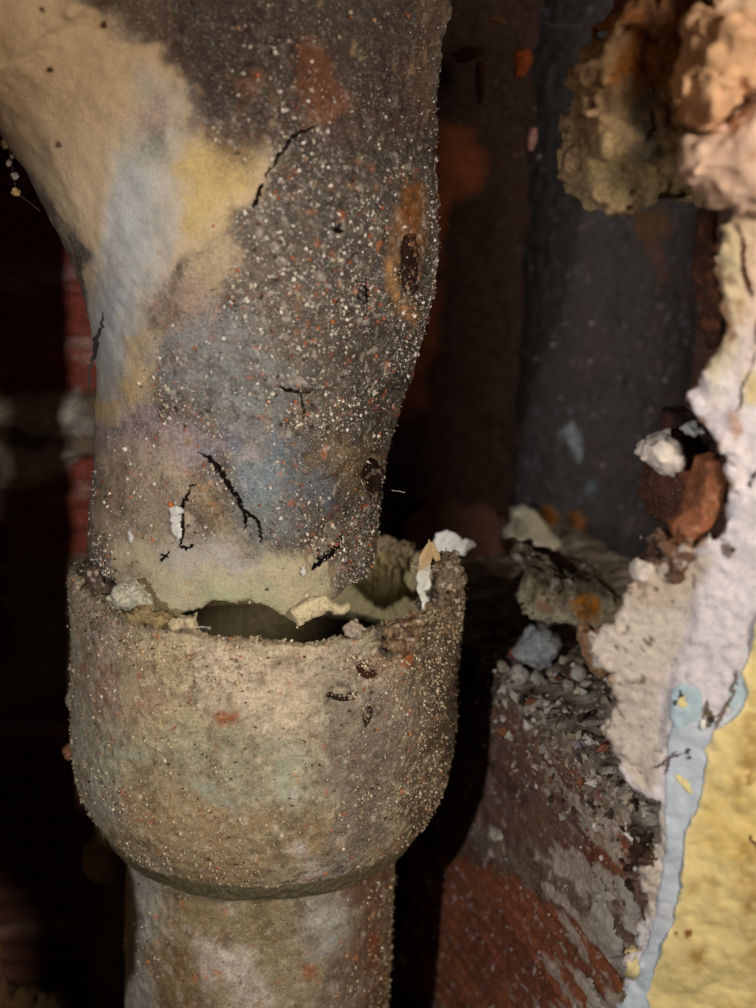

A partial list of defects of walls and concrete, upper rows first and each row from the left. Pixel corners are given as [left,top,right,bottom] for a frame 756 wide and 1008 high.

crack [251,124,319,208]
crack [160,452,263,562]
spalling [311,534,343,570]
spalling [629,557,653,582]